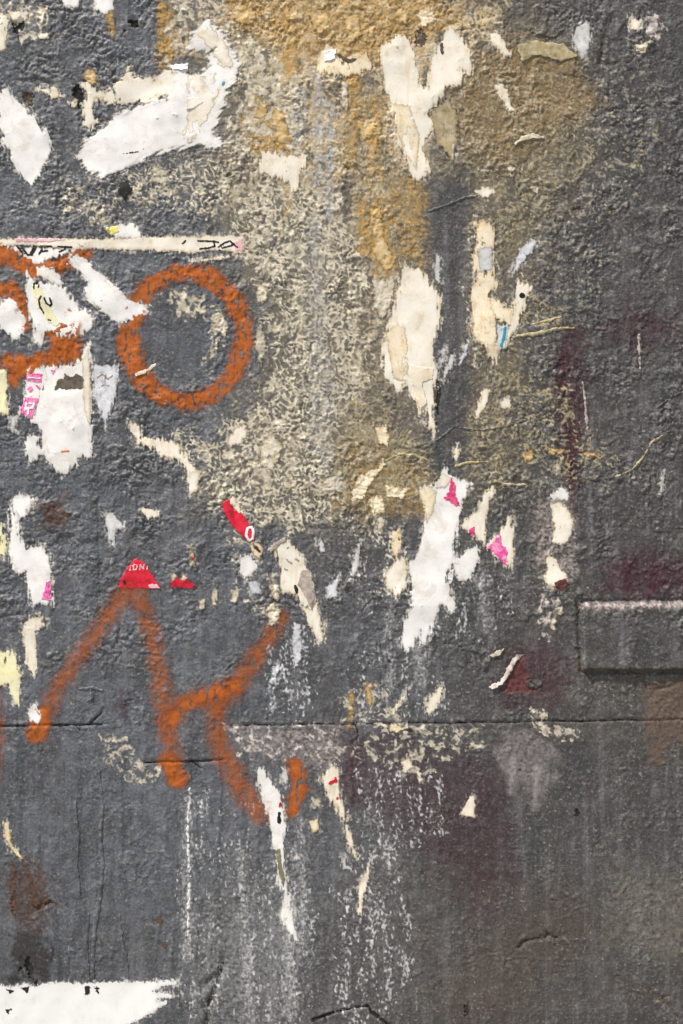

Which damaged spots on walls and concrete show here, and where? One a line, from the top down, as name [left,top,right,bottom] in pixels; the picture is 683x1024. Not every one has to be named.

crack [0,711,103,731]
crack [518,931,557,948]